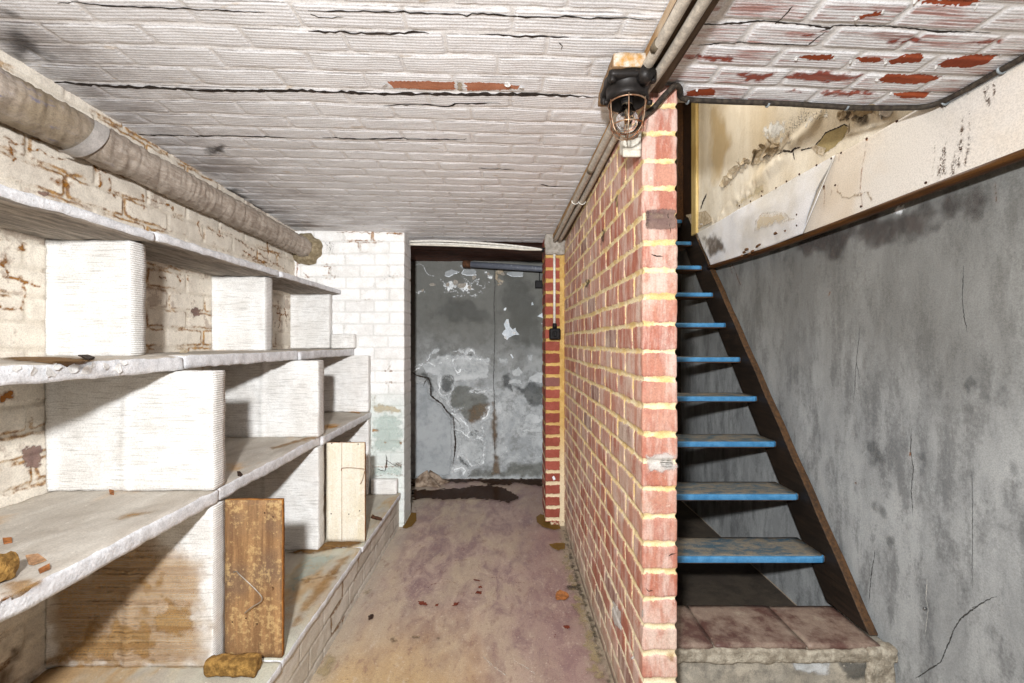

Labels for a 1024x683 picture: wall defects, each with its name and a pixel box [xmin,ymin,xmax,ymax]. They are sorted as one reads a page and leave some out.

peeling [913,0,980,10]
crack [698,6,991,46]
peeling [688,54,733,62]
peeling [737,37,1002,98]
crack [54,81,593,107]
peeling [685,88,716,97]
crack [330,134,465,142]
water stain [763,109,827,143]
peeling [502,307,519,340]
crack [412,372,462,463]
crack [916,490,997,678]